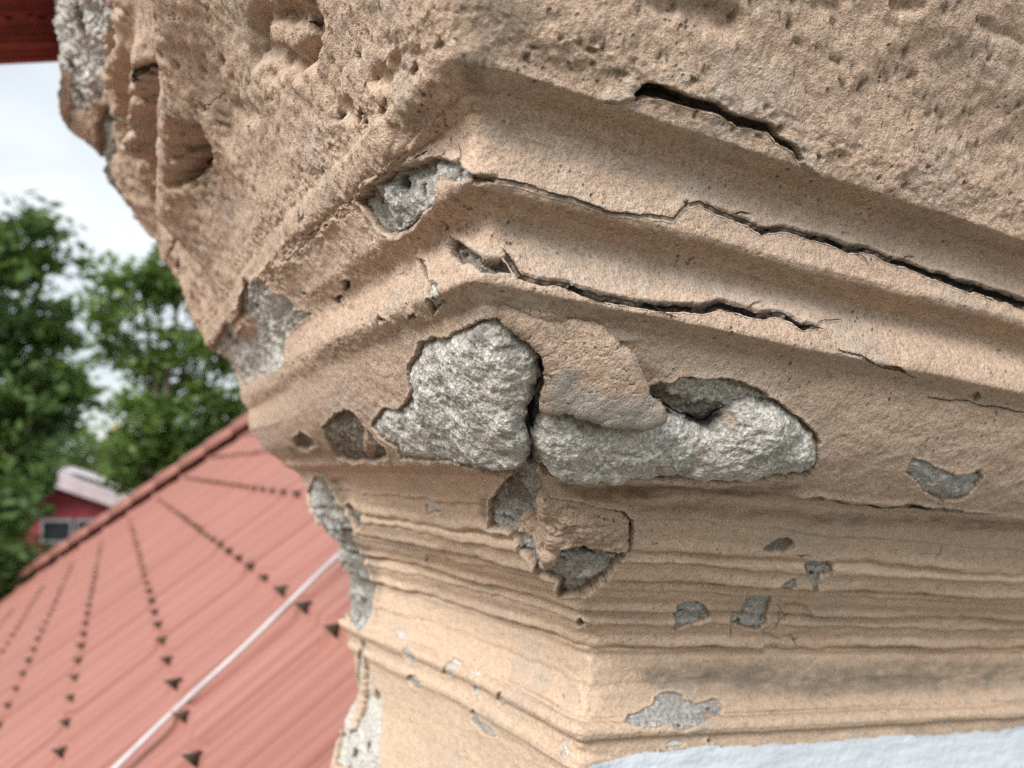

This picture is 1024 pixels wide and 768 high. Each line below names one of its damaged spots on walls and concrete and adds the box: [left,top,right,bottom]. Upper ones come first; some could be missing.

spalling [52,0,135,213]
crack [594,86,830,186]
spalling [368,160,473,232]
crack [458,145,1024,311]
spalling [215,281,311,385]
spalling [323,317,817,589]
spalling [906,458,980,499]
spalling [310,476,377,631]
spalling [671,601,708,628]
spalling [804,561,830,588]
spalling [338,644,383,768]
spalling [626,692,721,750]